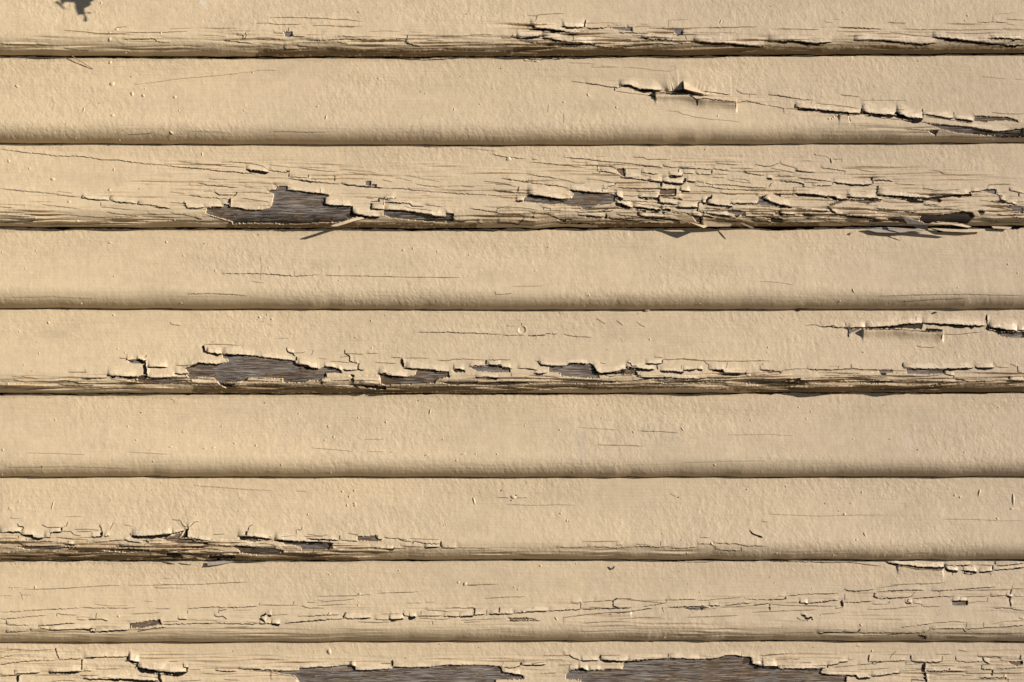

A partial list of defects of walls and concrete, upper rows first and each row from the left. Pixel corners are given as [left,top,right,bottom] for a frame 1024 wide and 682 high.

peeling [517,20,592,43]
peeling [855,32,1022,44]
peeling [797,101,1024,136]
peeling [185,176,453,226]
peeling [517,169,1023,234]
peeling [844,313,1024,338]
peeling [98,347,810,385]
peeling [105,528,338,566]
crack [0,514,1024,682]
peeling [15,652,186,680]
peeling [240,653,554,682]
peeling [566,651,899,682]